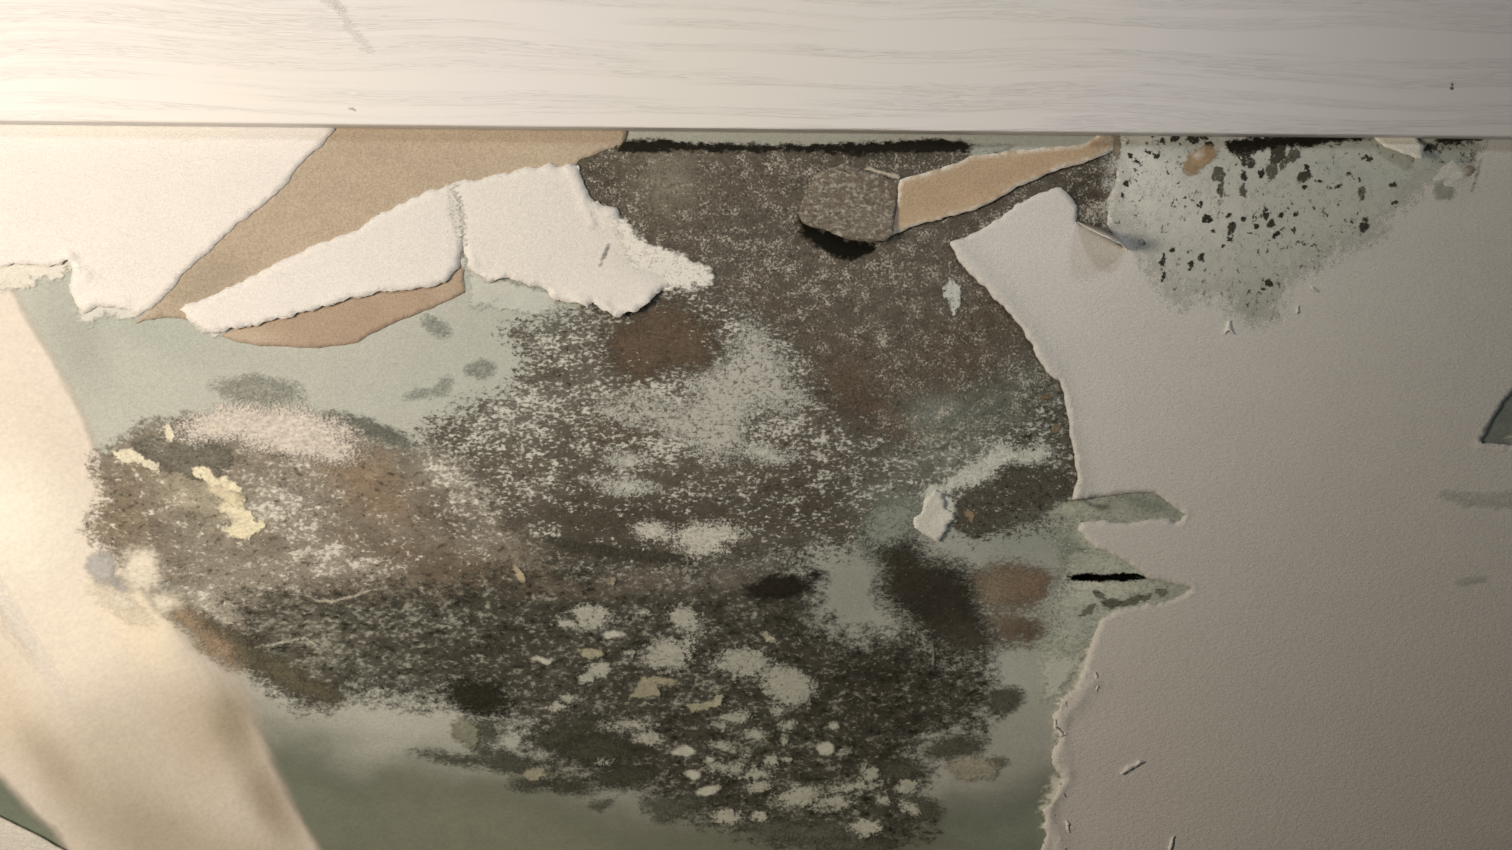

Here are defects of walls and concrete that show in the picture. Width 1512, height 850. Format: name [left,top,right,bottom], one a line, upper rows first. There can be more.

damp [1423,139,1481,153]
spalling [798,220,875,260]
peeling [942,278,961,316]
peeling [163,424,175,442]
peeling [113,448,160,473]
damp [0,136,1373,850]
peeling [913,484,975,542]
crack [1068,572,1146,583]
spalling [1037,492,1191,661]